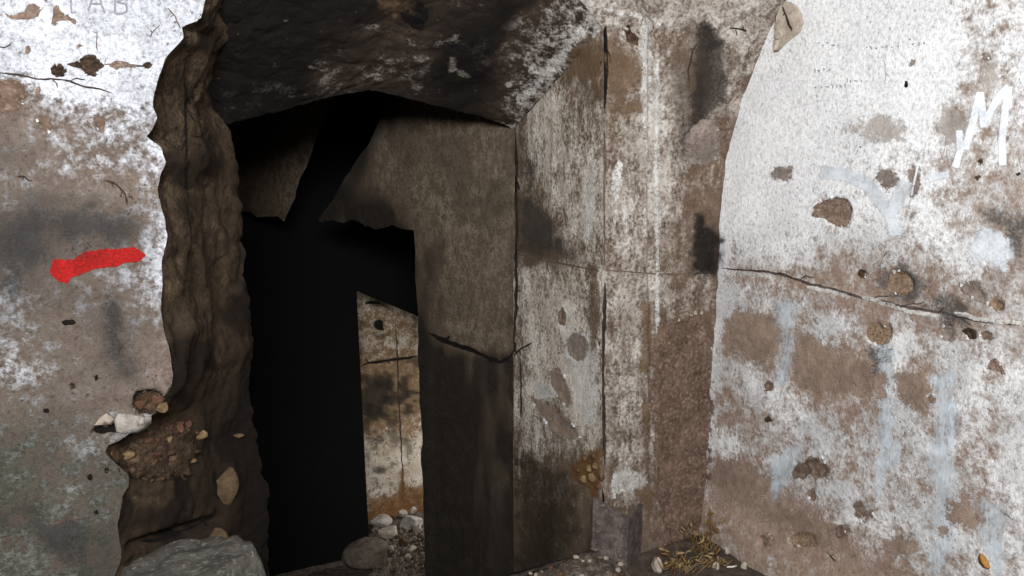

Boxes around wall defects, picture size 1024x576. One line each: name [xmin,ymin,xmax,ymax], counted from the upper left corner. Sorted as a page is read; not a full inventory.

damp [703,26,720,49]
spalling [50,44,152,77]
damp [695,214,705,233]
spalling [810,197,852,228]
crack [428,26,1024,465]
crack [362,323,417,493]
flaking render [528,365,581,441]